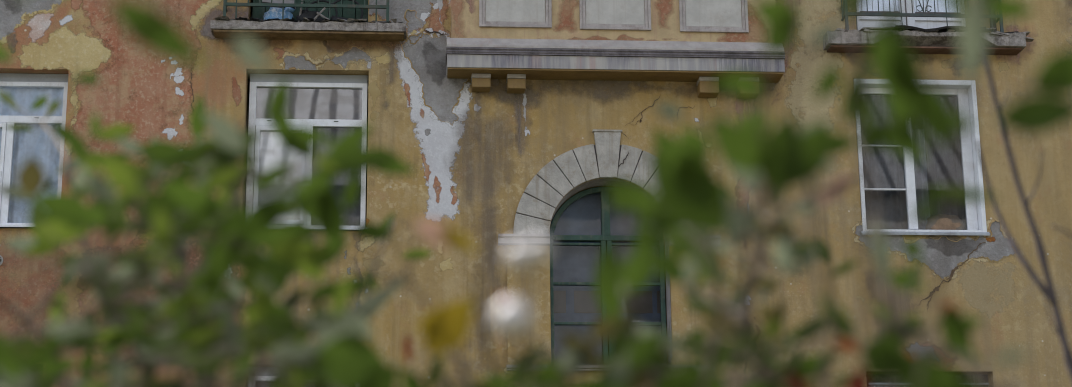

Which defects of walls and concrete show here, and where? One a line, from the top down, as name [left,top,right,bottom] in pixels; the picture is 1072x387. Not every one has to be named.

peeling [131,0,222,51]
peeling [0,0,194,165]
peeling [279,0,482,221]
crack [619,94,695,166]
spalling [888,219,1015,280]
crack [921,242,986,311]